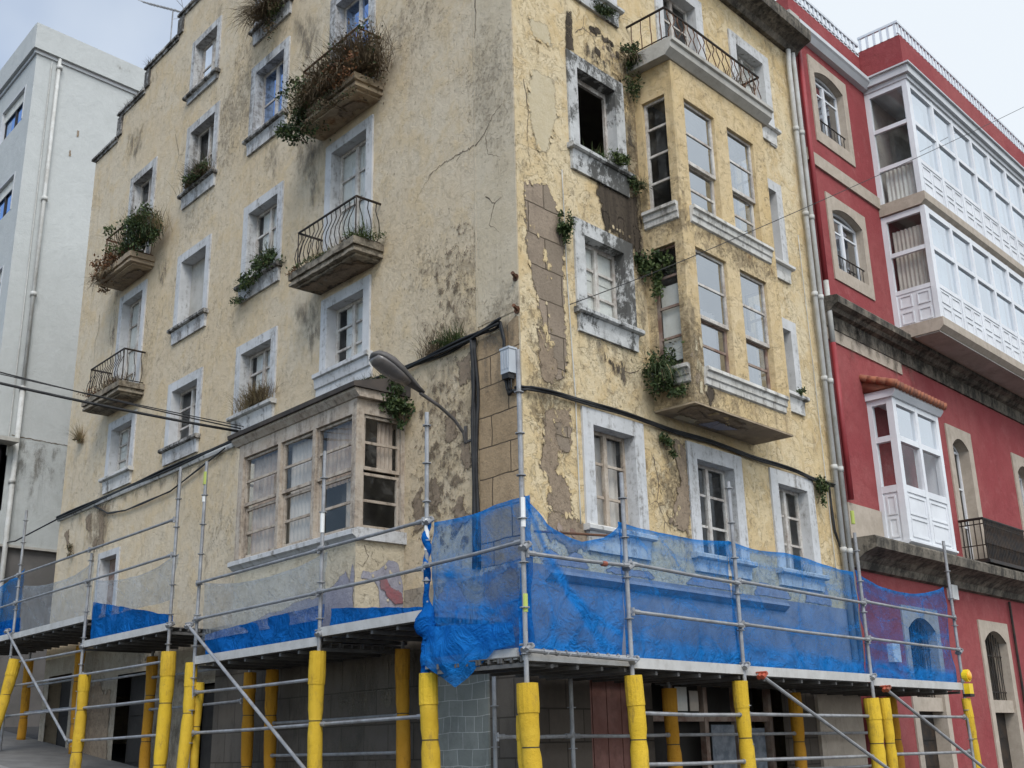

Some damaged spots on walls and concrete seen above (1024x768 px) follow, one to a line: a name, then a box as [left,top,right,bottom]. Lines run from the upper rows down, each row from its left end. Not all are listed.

peeling [575,24,628,82]
crack [416,79,531,201]
flaking render [524,180,569,390]
flaking render [539,408,589,569]
crack [651,457,672,528]
peeling [256,560,403,627]